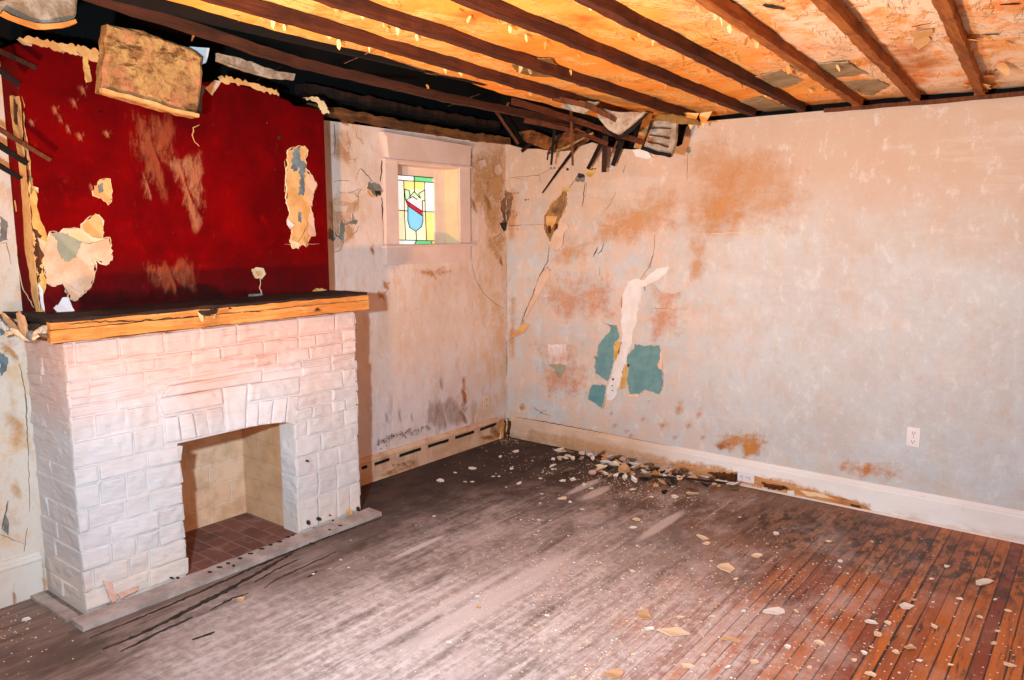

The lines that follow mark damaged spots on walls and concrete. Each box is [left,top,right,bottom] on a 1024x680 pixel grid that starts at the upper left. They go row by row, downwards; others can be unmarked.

peeling [0,95,113,312]
peeling [284,145,384,253]
flaking render [543,168,596,250]
crack [472,224,551,373]
peeling [641,266,670,288]
peeling [588,323,664,409]